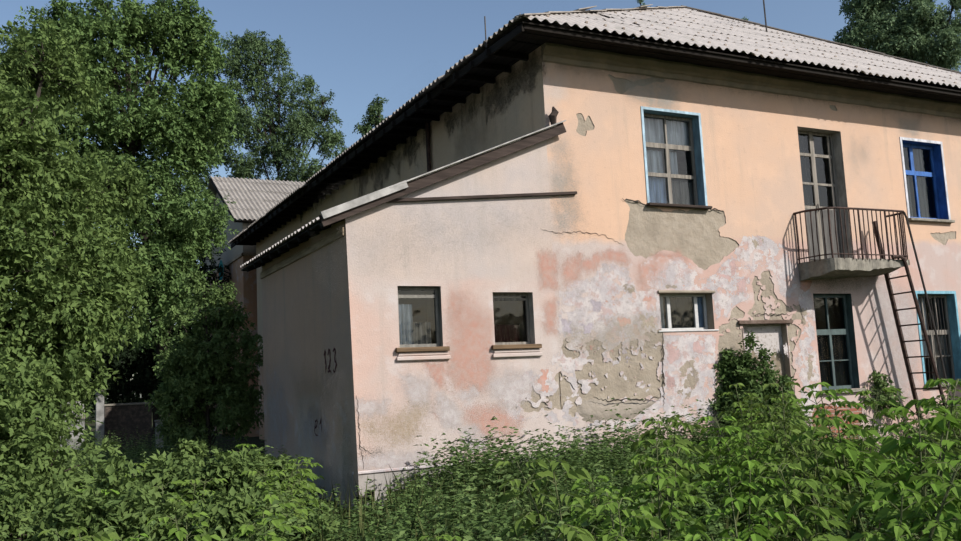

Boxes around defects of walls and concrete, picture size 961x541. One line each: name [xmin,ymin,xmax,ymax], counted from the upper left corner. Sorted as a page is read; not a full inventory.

damp [291,129,433,225]
damp [338,135,590,293]
flaking render [576,113,595,136]
damp [443,43,961,161]
flaking render [505,198,862,441]